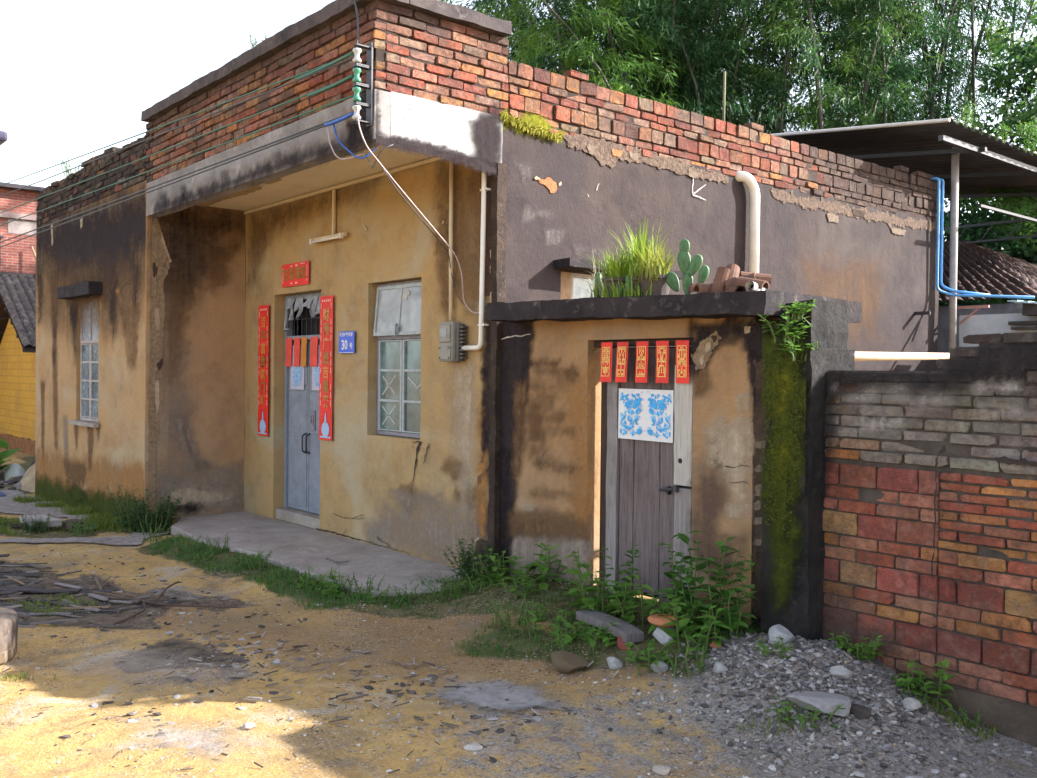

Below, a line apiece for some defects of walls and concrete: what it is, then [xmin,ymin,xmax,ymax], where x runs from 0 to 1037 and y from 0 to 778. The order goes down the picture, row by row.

flaking render [563,133,729,184]
flaking render [535,176,562,193]
damp [35,89,590,586]
flaking render [691,331,722,372]
crack [411,441,429,490]